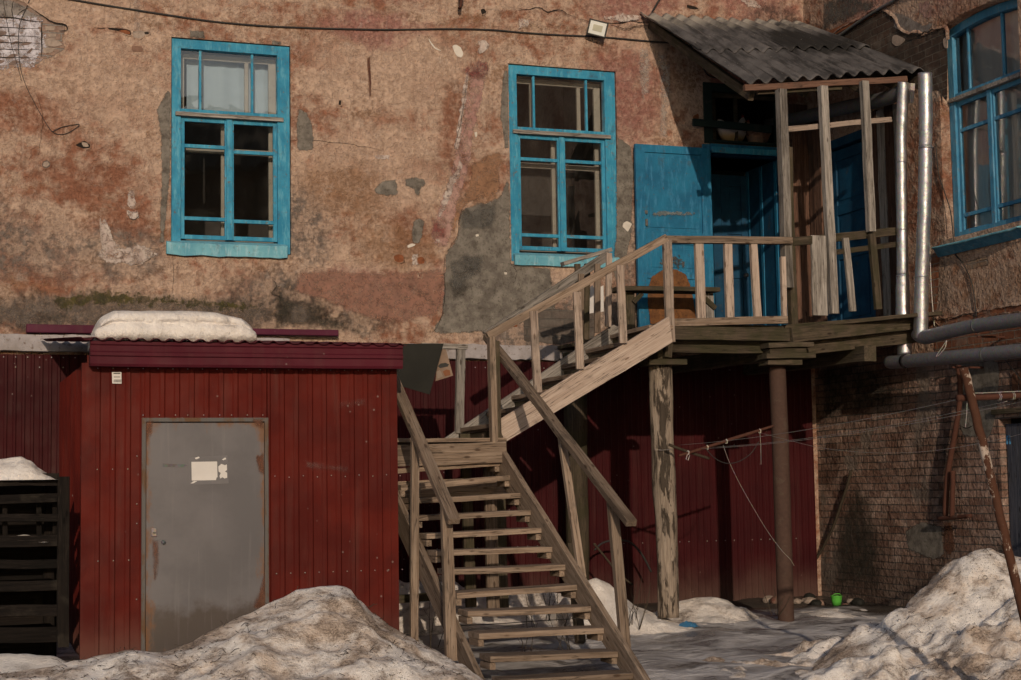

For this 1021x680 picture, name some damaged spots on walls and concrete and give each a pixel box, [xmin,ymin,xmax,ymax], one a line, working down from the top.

flaking render [0,0,68,70]
flaking render [828,0,950,101]